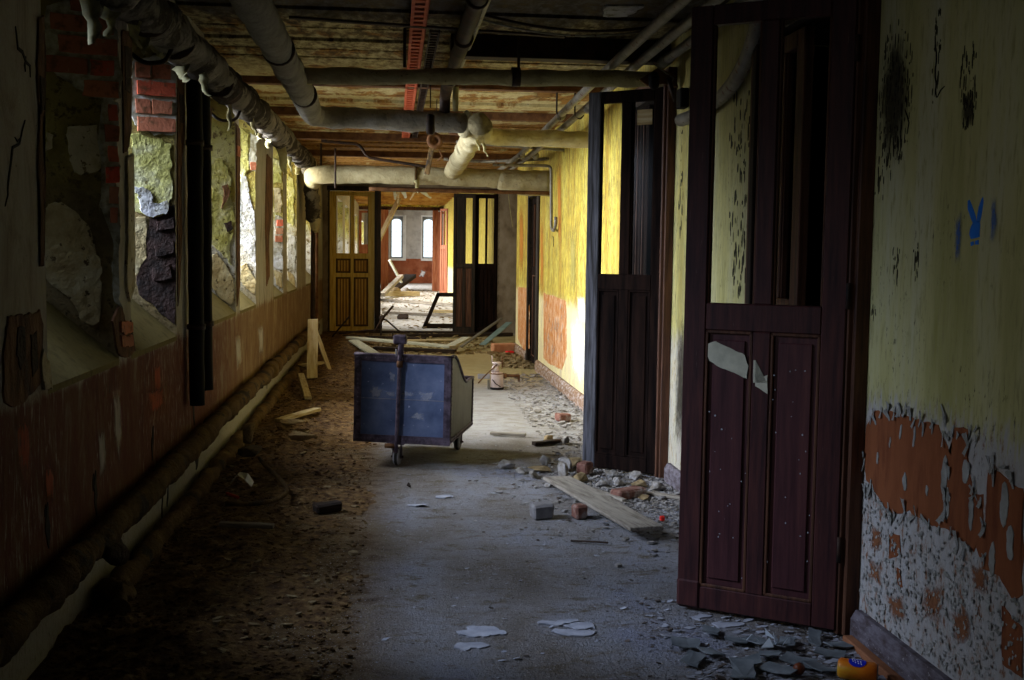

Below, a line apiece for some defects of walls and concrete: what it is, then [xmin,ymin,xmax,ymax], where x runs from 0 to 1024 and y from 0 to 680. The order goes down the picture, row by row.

crack [15,26,31,77]
damp [874,19,913,200]
damp [960,43,977,130]
crack [5,120,26,207]
spalling [35,0,185,358]
peeling [859,401,1024,678]
peeling [617,597,862,680]